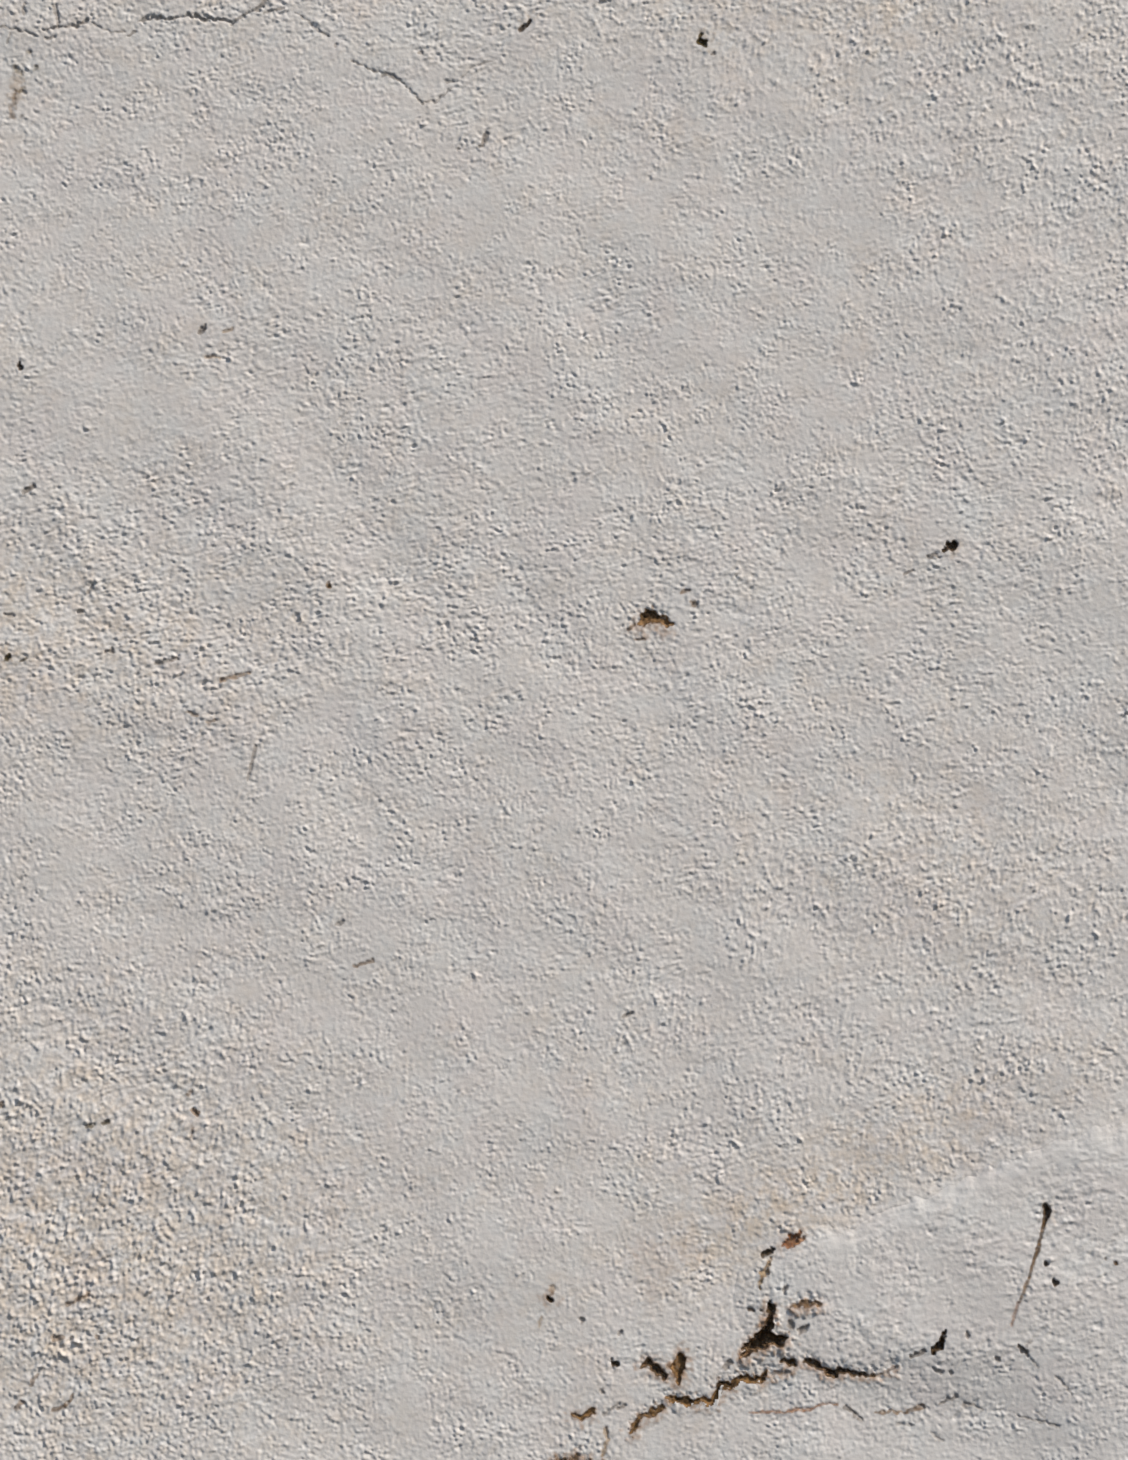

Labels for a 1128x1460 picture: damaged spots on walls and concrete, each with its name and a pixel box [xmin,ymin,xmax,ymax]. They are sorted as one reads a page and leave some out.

flaking render [627,606,674,640]
crack [910,1330,946,1358]
crack [630,1358,925,1434]